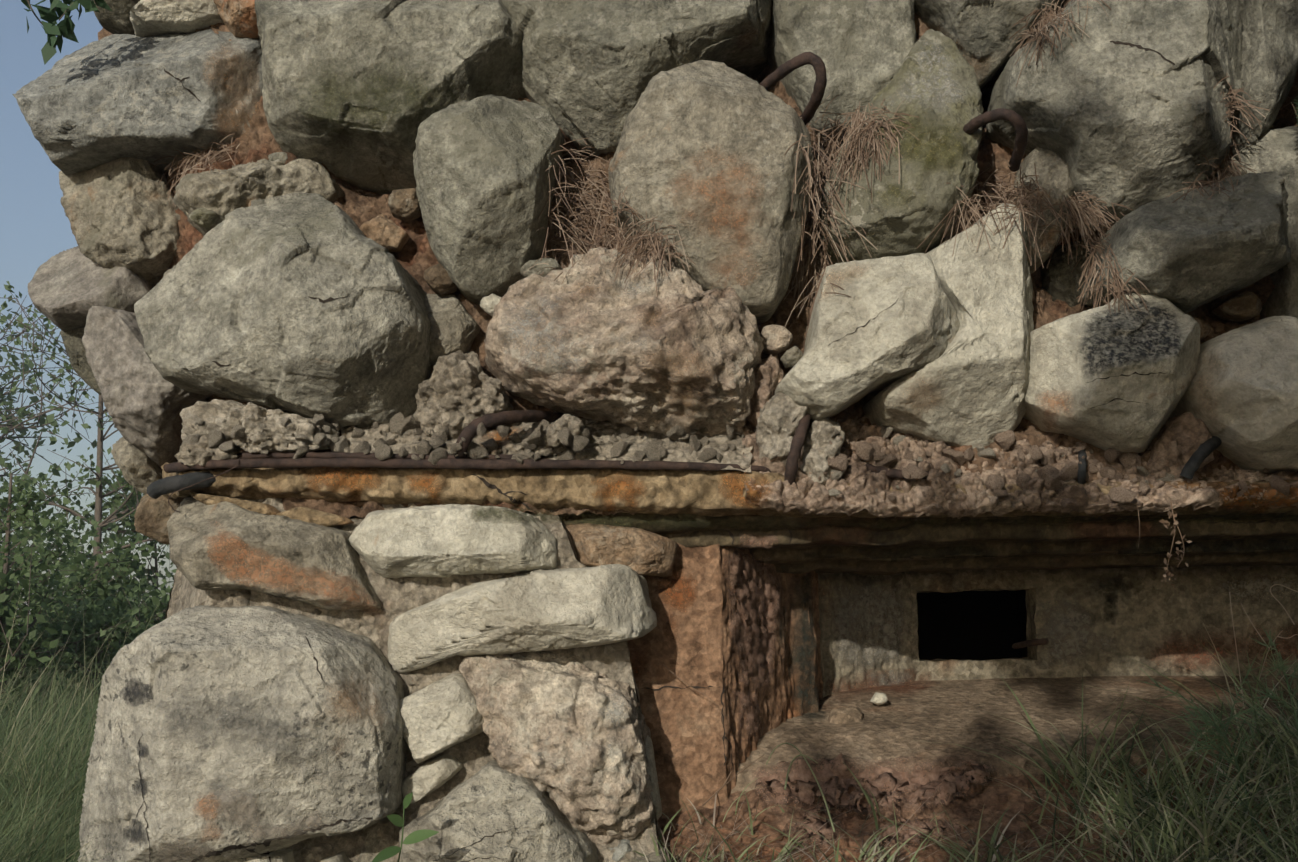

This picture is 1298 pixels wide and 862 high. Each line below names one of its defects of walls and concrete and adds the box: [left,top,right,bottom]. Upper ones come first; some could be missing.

rust [308,468,378,497]
crack [470,474,535,512]
crack [633,678,734,772]